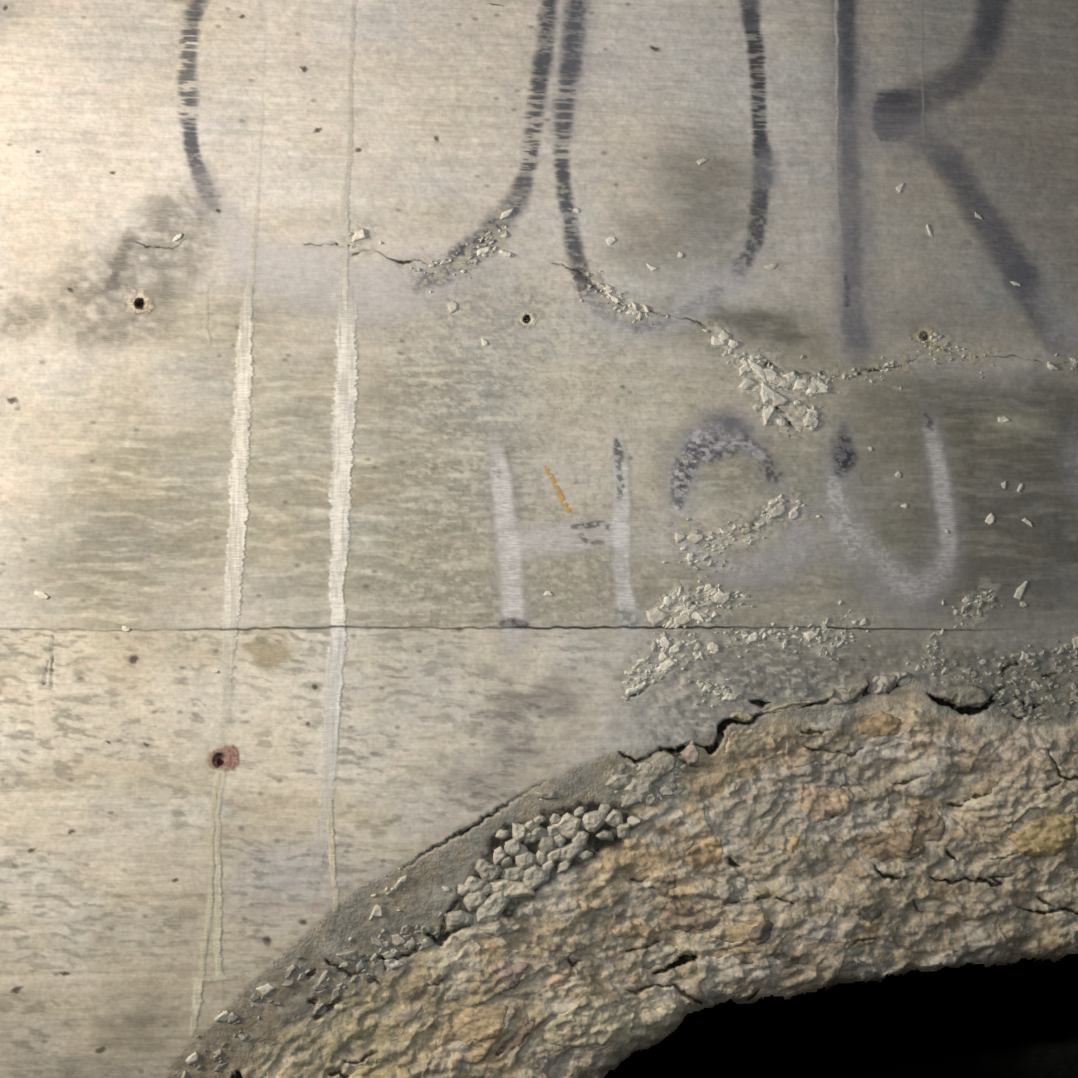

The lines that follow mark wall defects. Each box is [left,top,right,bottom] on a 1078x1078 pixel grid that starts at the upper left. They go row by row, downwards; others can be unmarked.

crack [304,243,421,264]
spalling [702,319,1000,440]
crack [858,361,909,374]
water stain [221,221,255,704]
water stain [320,10,359,911]
crack [619,700,775,764]
crack [802,699,829,707]
crack [856,684,899,702]
crack [927,662,1041,719]
spalling [167,486,1078,1078]
water stain [190,772,233,1035]